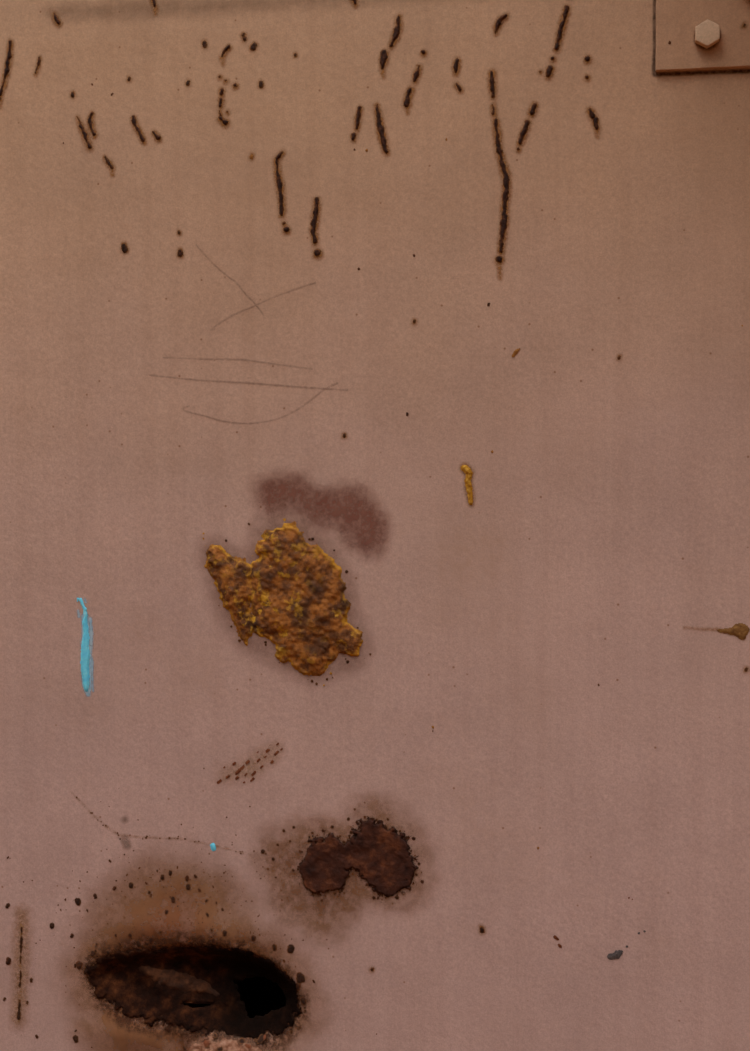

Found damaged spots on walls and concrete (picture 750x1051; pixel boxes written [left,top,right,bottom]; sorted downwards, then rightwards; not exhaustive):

rust [0,40,14,105]
rust [539,5,570,80]
rust [76,111,97,150]
rust [350,103,390,155]
rust [517,103,538,153]
rust [273,151,290,234]
rust [488,70,511,280]
rust [309,197,323,259]
rust [202,477,386,686]
rust [705,623,750,640]
rust [253,802,424,932]
peeling [74,943,98,983]